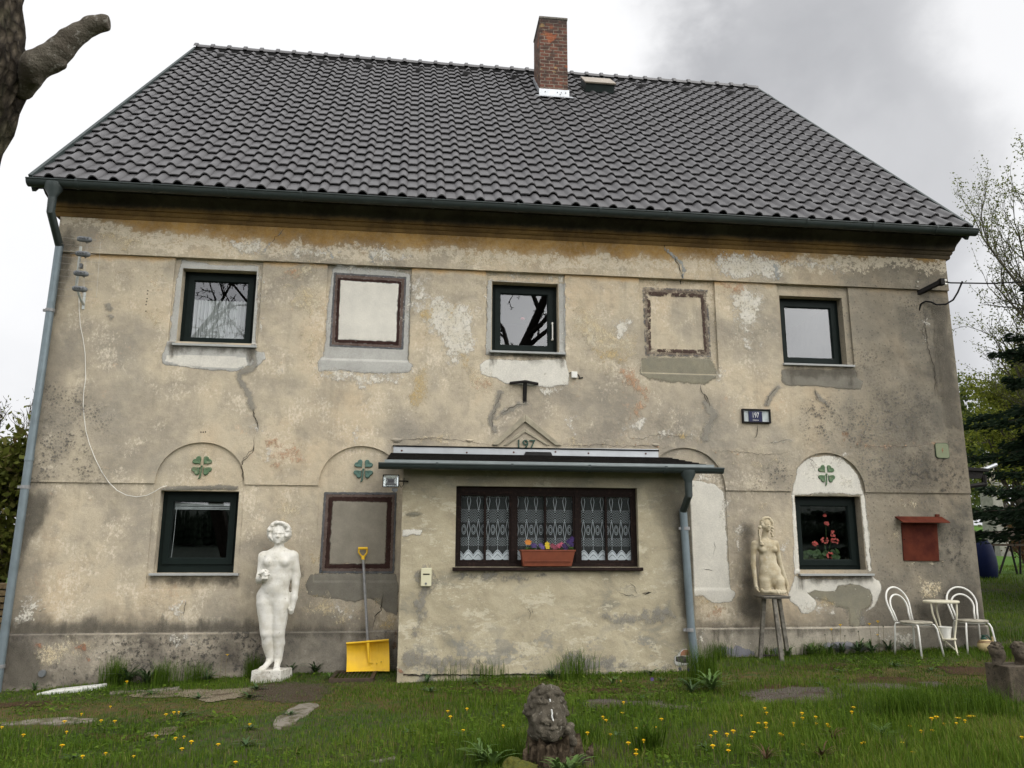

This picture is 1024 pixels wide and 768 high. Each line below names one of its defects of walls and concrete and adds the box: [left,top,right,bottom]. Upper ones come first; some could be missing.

peeling [341,244,408,273]
crack [664,245,687,284]
peeling [400,274,492,367]
crack [237,349,259,483]
crack [404,390,527,444]
spalling [789,576,881,627]
water stain [7,617,261,687]